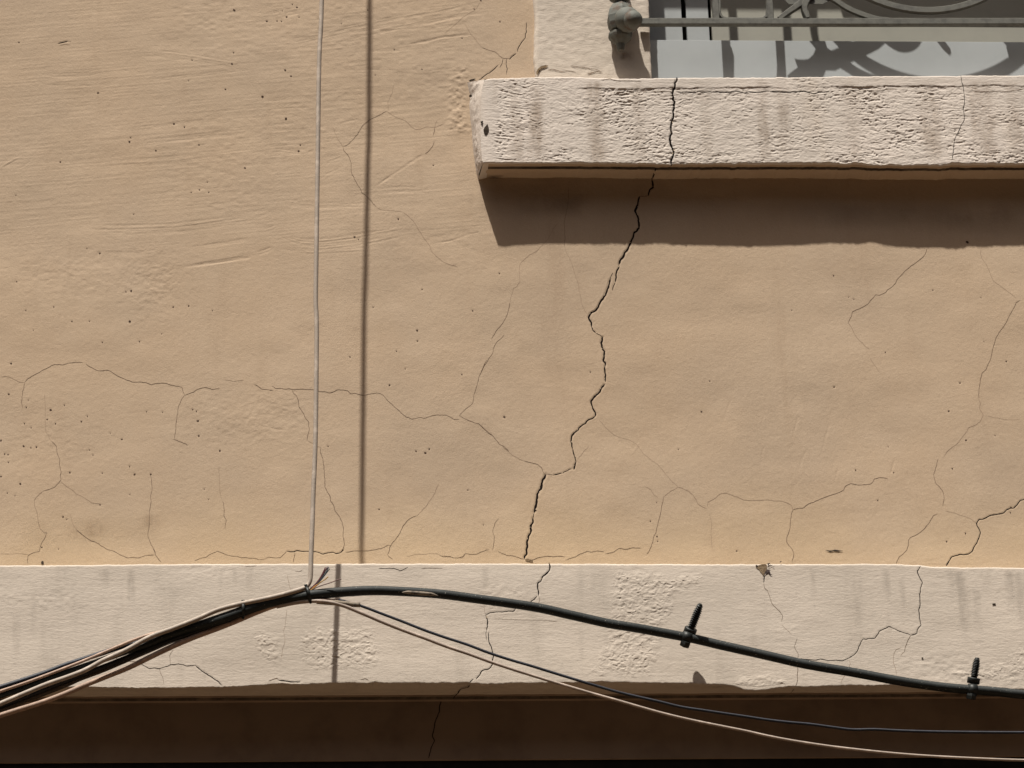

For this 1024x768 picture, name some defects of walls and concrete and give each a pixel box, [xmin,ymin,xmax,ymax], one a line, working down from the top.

crack [451,10,527,79]
crack [0,78,887,758]
spalling [756,561,781,576]
crack [763,252,1024,690]